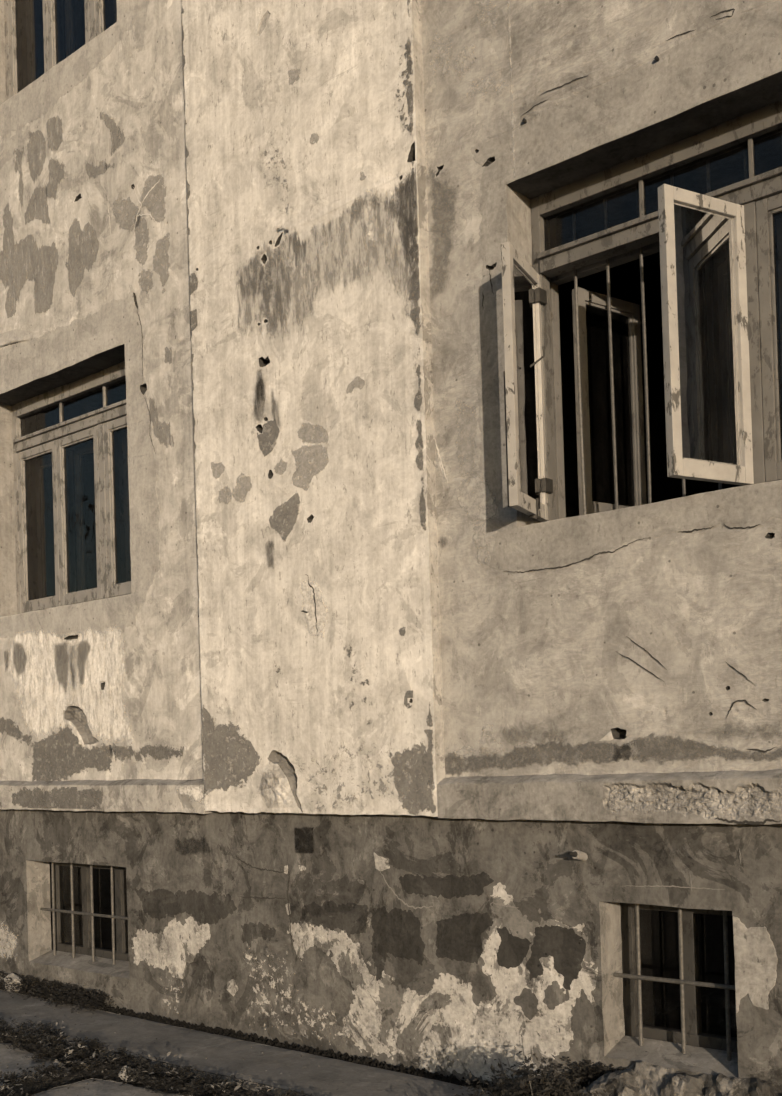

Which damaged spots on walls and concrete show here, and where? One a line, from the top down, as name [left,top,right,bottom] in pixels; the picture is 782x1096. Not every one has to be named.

crack [666,9,735,41]
crack [523,76,586,115]
crack [680,524,760,533]
crack [504,538,645,573]
flaking render [64,706,99,747]
spalling [599,728,627,741]
flaking render [267,750,303,812]
spalling [602,782,782,820]
peeling [374,853,390,871]
peeling [131,887,237,980]
peeling [227,979,238,996]
flaking render [241,872,598,1081]